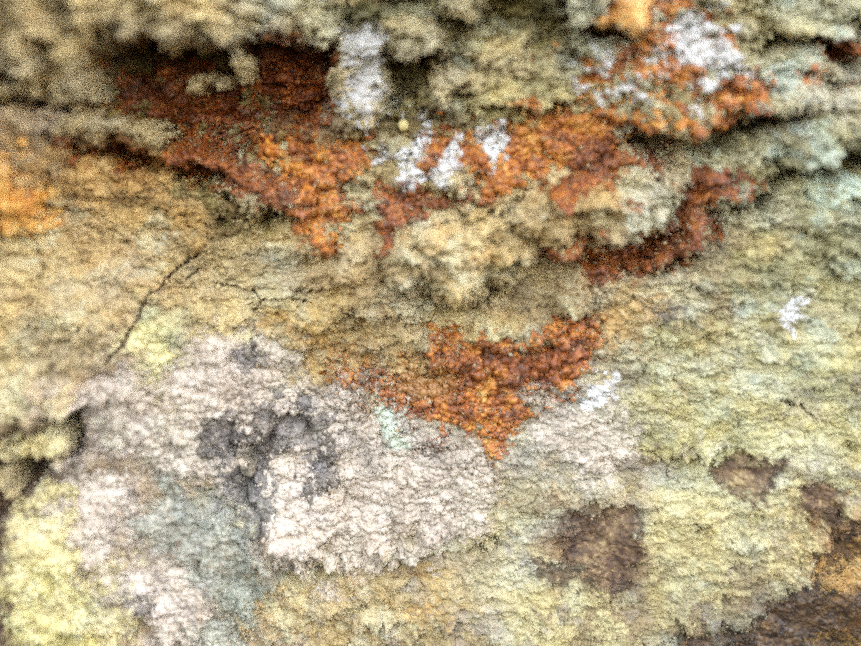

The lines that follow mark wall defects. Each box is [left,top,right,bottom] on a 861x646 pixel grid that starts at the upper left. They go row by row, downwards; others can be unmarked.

corrosion [0,0,780,481]
leakage [328,12,511,193]
leakage [399,0,758,121]
leakage [0,314,517,646]